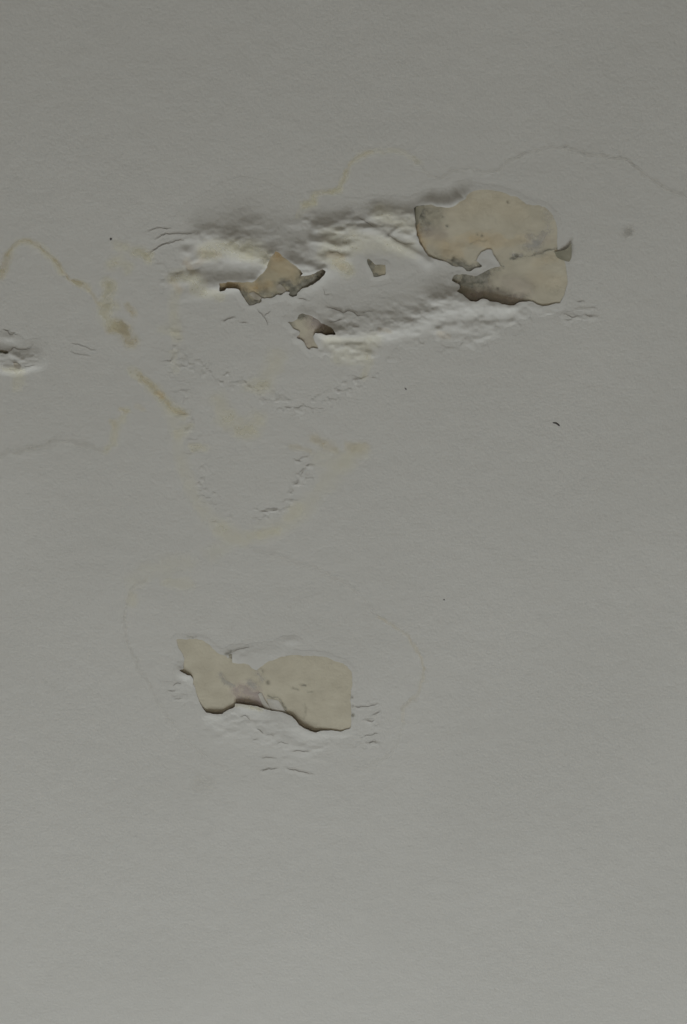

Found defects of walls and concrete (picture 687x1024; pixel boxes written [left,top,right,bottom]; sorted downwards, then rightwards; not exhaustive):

peeling [219,251,335,356]
peeling [364,255,390,283]
peeling [410,179,573,318]
peeling [171,633,358,741]